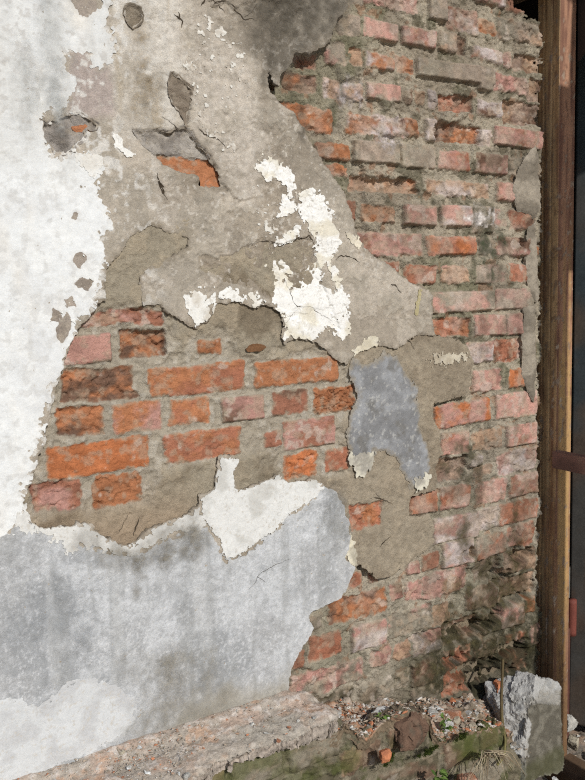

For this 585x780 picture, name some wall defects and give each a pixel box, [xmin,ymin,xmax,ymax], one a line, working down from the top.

peeling [73,252,87,269]
peeling [74,277,94,291]
peeling [50,308,76,343]
flaking render [75,307,96,330]
flaking render [245,344,266,352]
peeling [433,351,468,365]
flaking render [38,375,61,428]
peeling [345,350,431,490]
flaking render [29,428,47,463]
peeling [413,472,432,493]
peeling [201,454,324,564]
peeling [7,503,206,557]